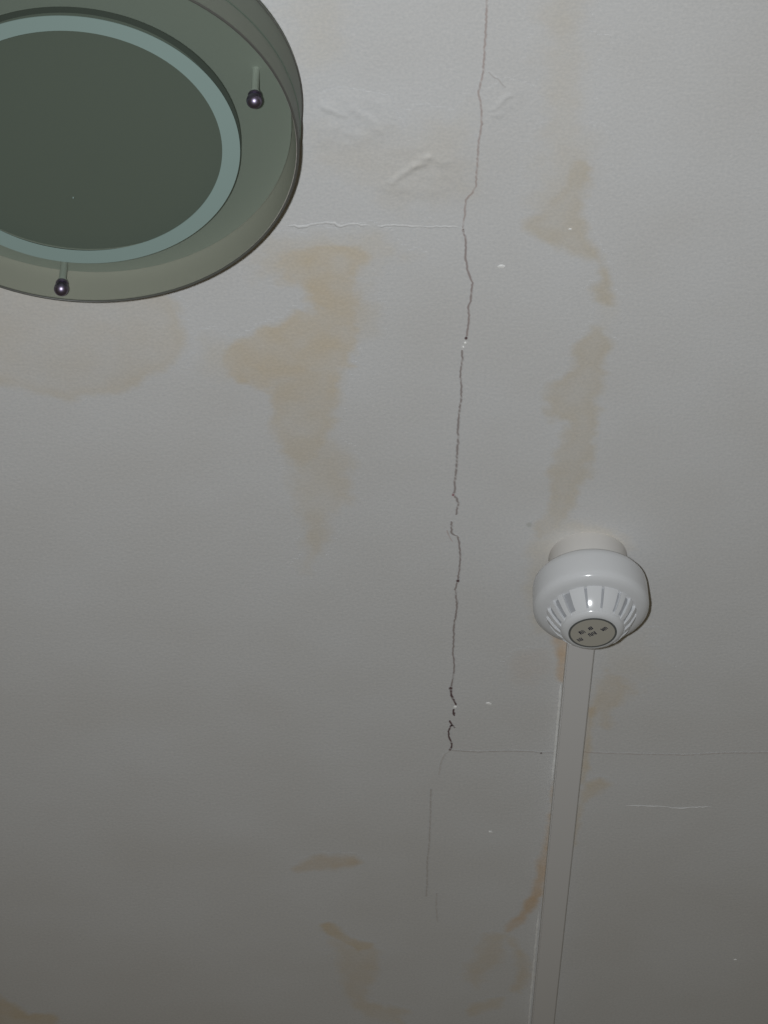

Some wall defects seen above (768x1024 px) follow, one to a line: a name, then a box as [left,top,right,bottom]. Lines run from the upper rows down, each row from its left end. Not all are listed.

damp [0,0,490,580]
crack [446,0,506,751]
damp [514,0,642,638]
damp [573,627,676,852]